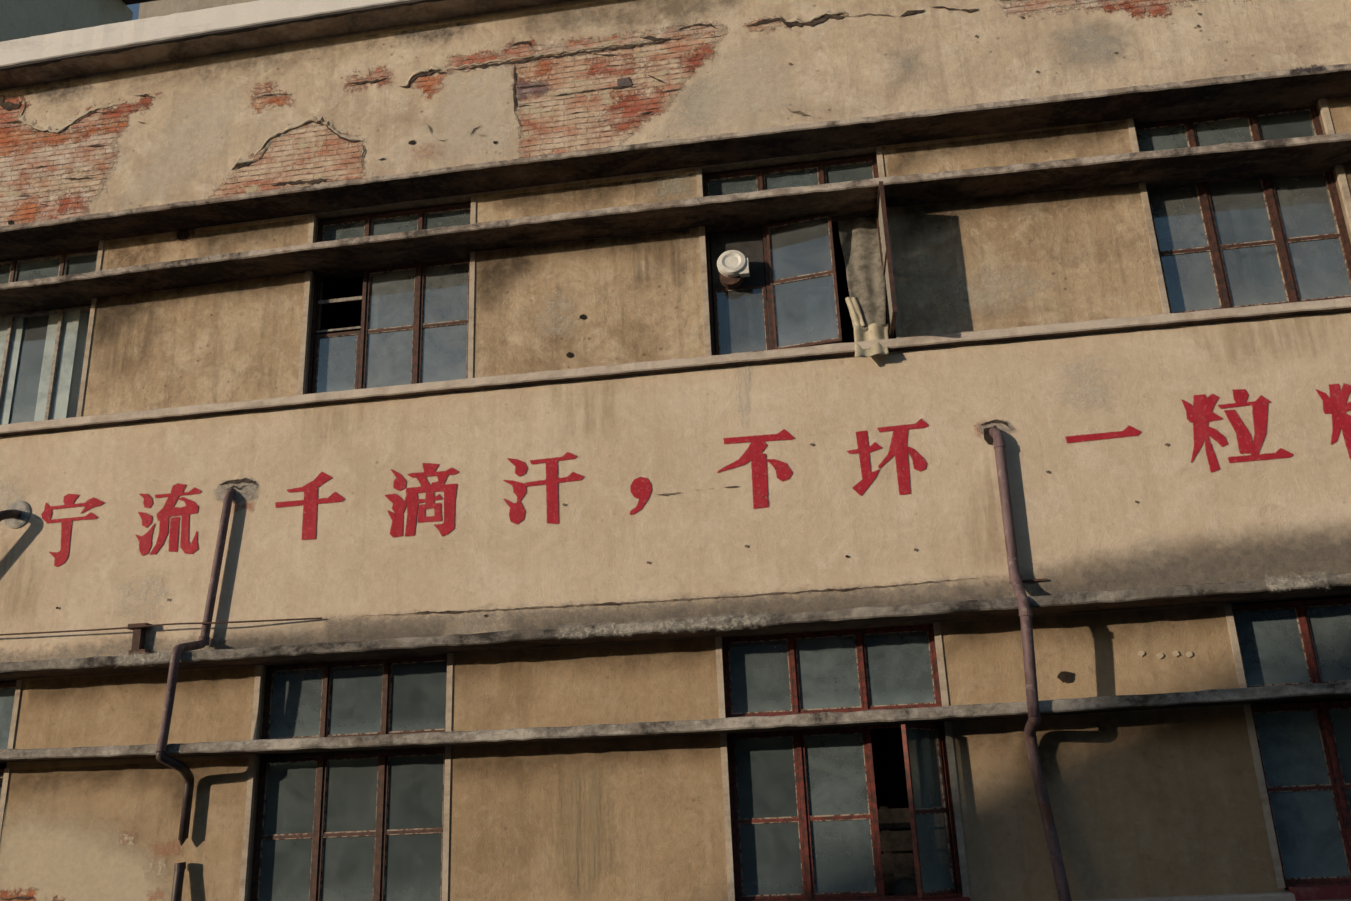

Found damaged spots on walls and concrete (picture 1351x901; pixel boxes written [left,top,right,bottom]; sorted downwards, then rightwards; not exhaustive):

crack [744,6,978,31]
flaking render [996,0,1207,27]
flaking render [248,82,294,113]
flaking render [343,21,728,159]
flaking render [0,93,158,227]
flaking render [209,116,365,198]
peeling [0,814,170,901]